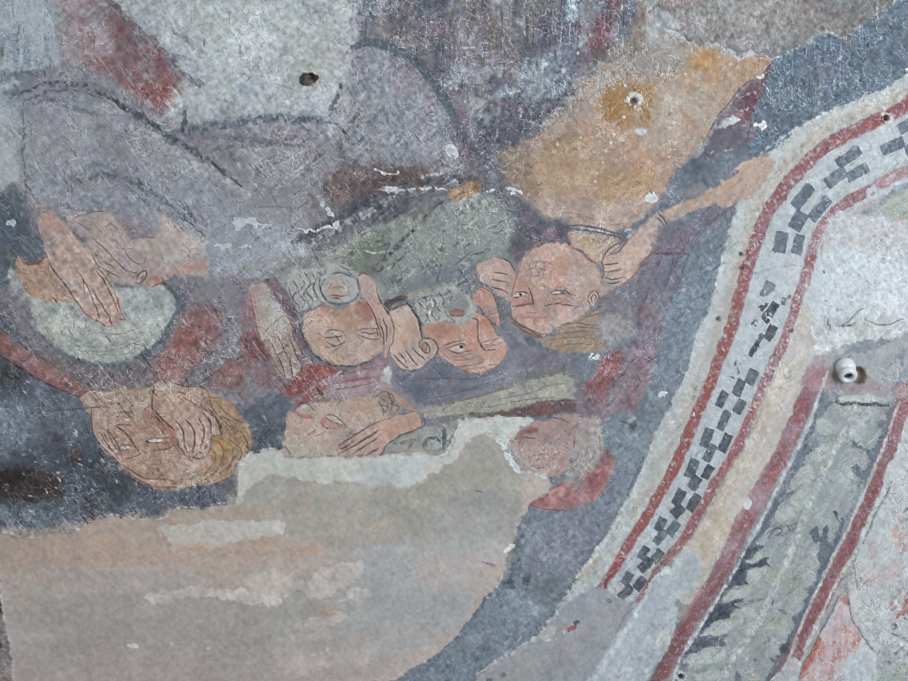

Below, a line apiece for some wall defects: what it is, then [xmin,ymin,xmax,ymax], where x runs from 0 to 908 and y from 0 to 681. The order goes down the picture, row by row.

flaking render [0,414,554,681]